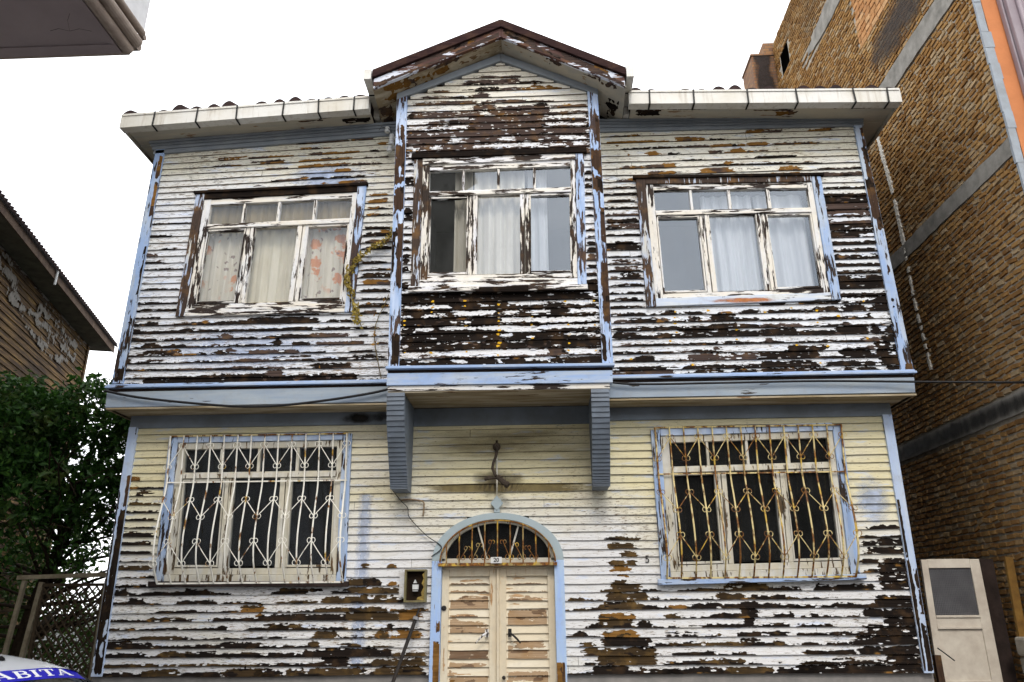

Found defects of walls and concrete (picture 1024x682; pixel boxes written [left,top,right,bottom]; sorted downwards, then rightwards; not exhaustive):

peeling [0,247,78,370]
peeling [115,29,913,384]
peeling [91,475,488,682]
peeling [508,499,933,682]